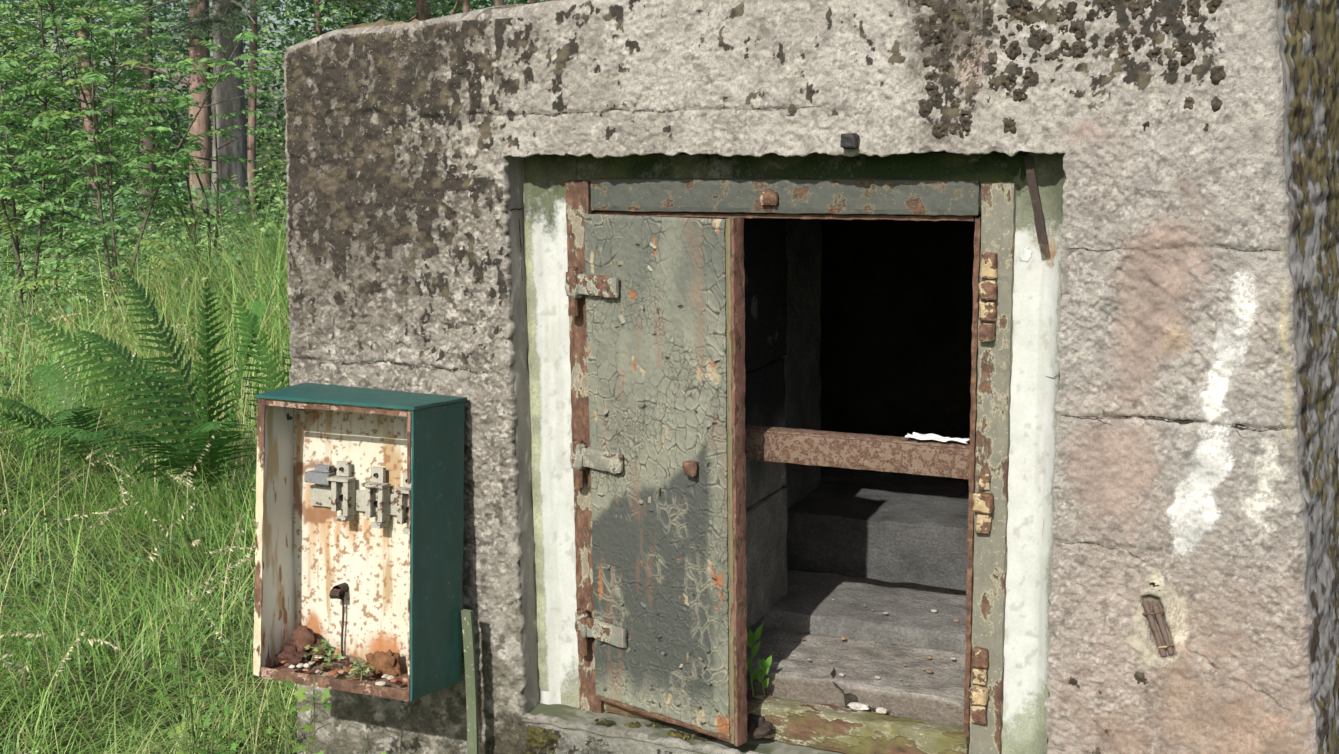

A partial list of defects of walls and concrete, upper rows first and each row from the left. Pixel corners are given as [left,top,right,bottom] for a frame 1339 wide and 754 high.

damp [1166,272,1291,555]
spalling [1123,569,1189,680]
damp [479,705,612,754]